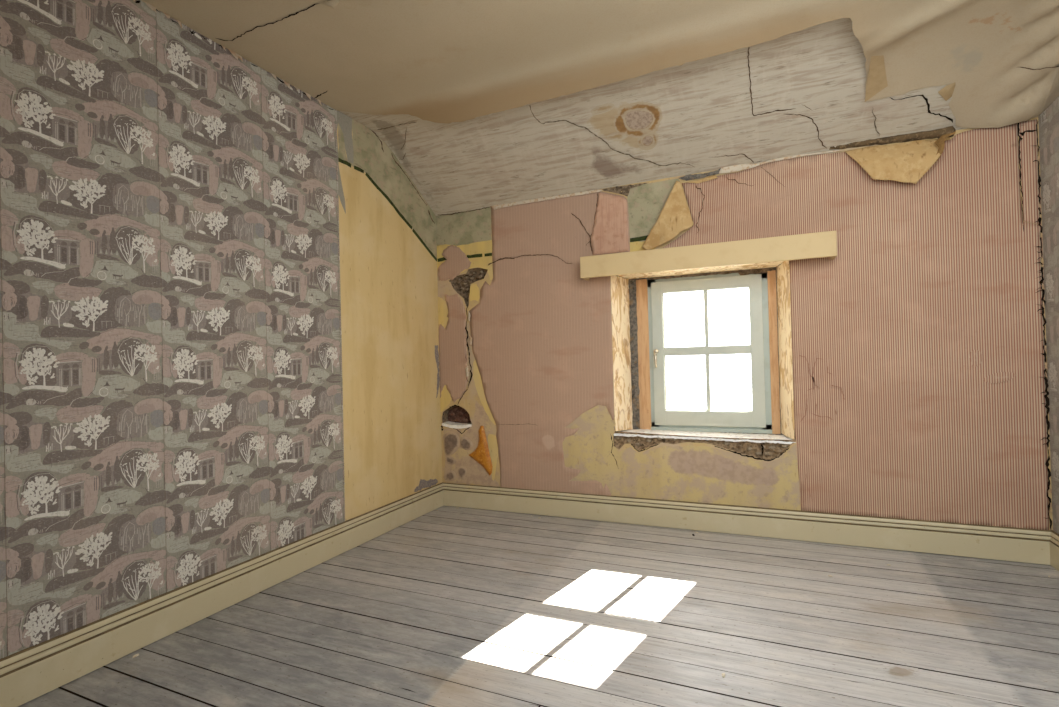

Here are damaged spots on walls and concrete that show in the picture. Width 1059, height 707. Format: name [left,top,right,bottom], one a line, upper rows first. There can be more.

crack [216,0,340,41]
water stain [581,97,668,185]
crack [747,48,826,148]
peeling [829,126,956,184]
crack [872,95,953,134]
peeling [591,182,649,255]
peeling [642,168,721,250]
spalling [449,268,487,308]
crack [1033,121,1052,529]
flaking render [413,401,500,493]
spalling [610,431,795,466]